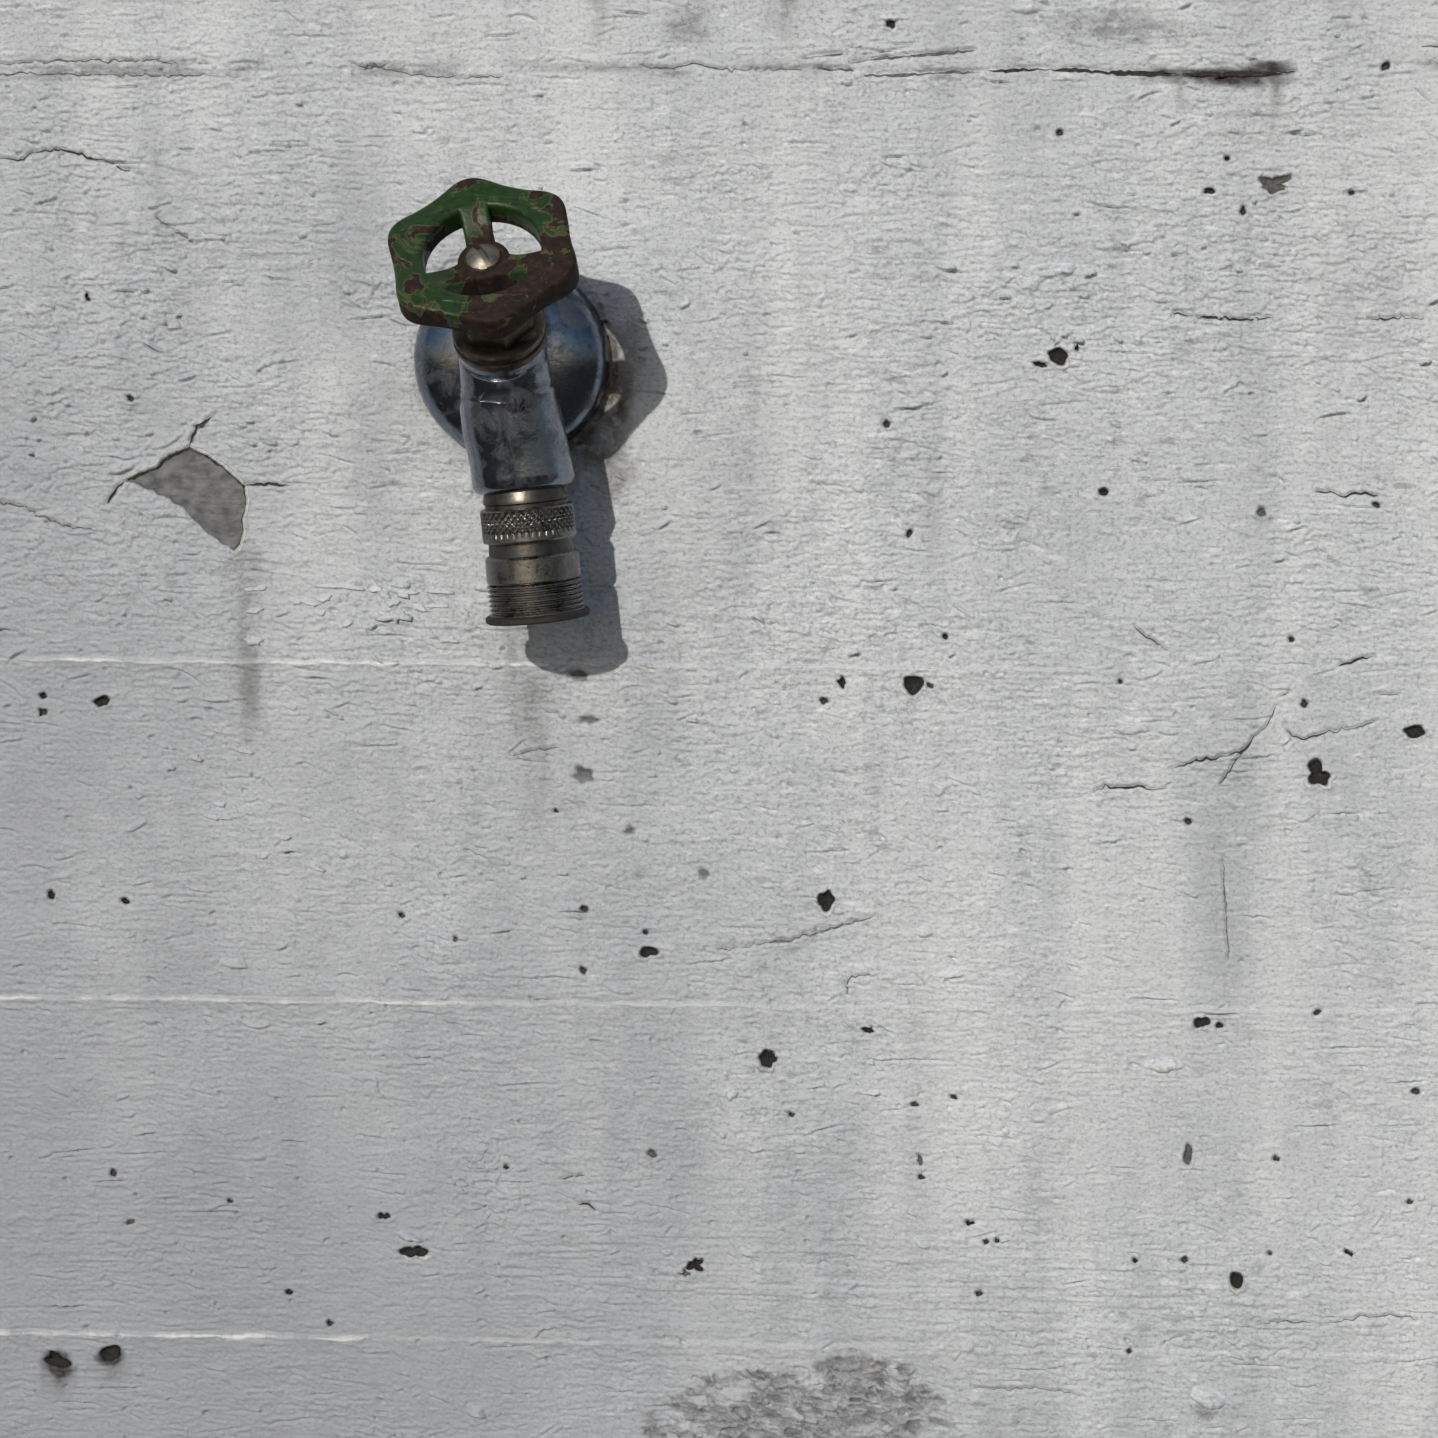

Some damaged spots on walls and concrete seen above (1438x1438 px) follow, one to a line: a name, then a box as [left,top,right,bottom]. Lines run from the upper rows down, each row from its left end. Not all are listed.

crack [645,50,1295,77]
spalling [107,416,287,554]
crack [1339,656,1374,666]
crack [1093,693,1397,793]
peeling [643,1357,944,1438]